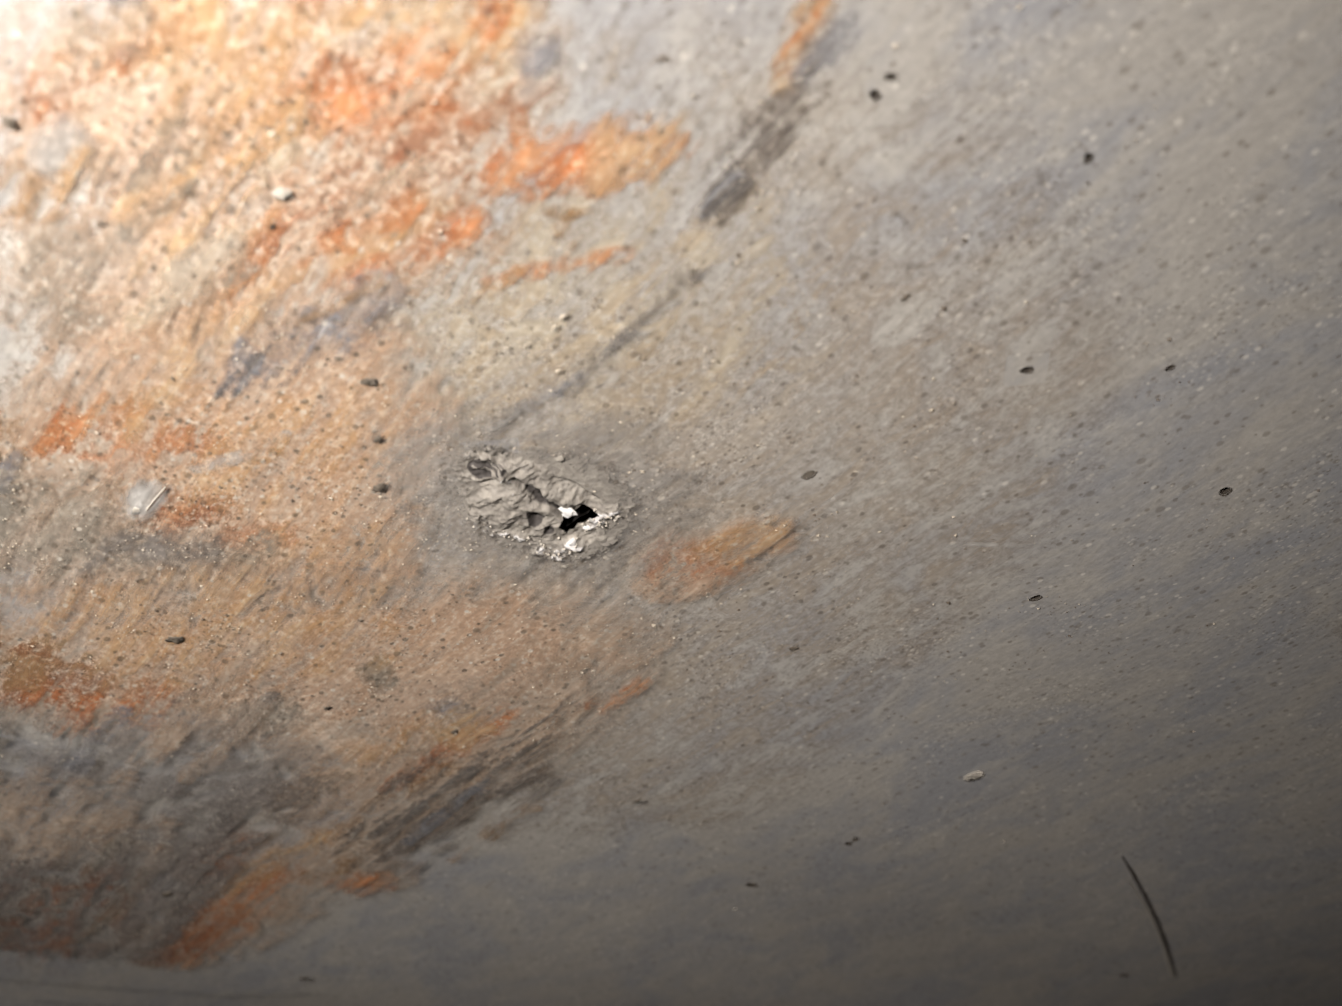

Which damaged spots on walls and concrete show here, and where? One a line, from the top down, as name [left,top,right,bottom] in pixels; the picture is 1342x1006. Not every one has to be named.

damp [217,338,272,396]
rust [0,0,685,968]
spalling [438,441,651,569]
damp [299,0,1015,861]
rust [632,520,793,597]